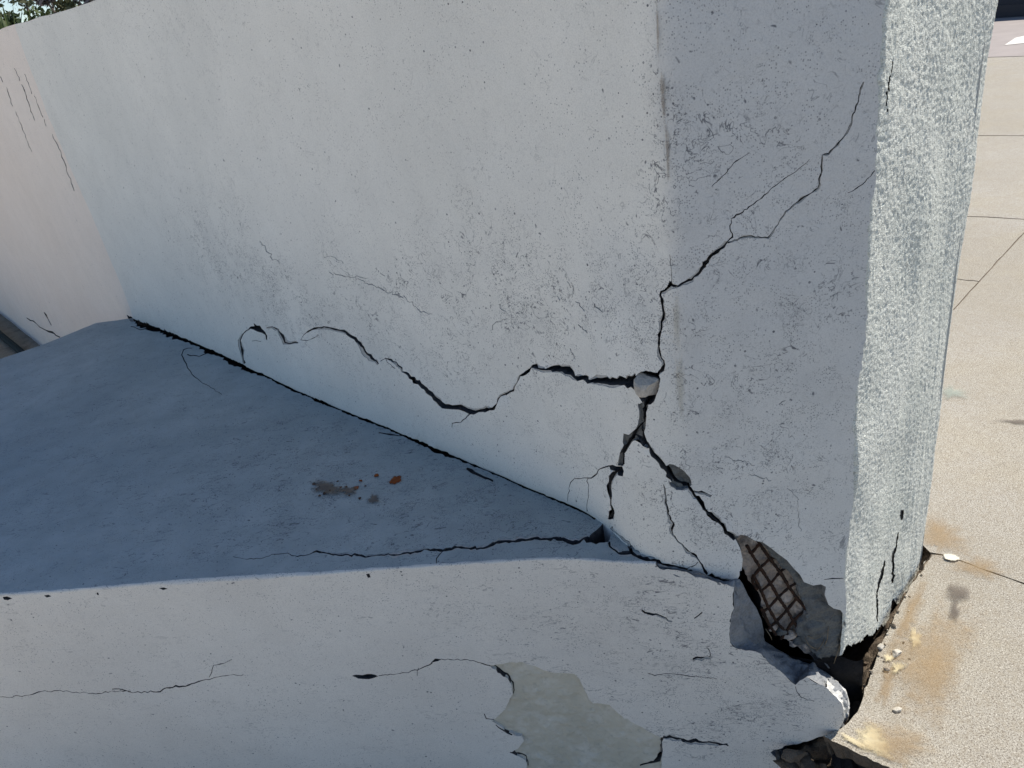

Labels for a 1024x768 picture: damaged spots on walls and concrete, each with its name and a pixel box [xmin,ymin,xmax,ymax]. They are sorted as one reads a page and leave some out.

crack [0,70,74,190]
crack [127,82,864,581]
corrosion [312,474,401,503]
spalling [716,521,846,668]
crack [878,509,903,583]
crack [7,659,242,698]
peeling [431,659,664,768]